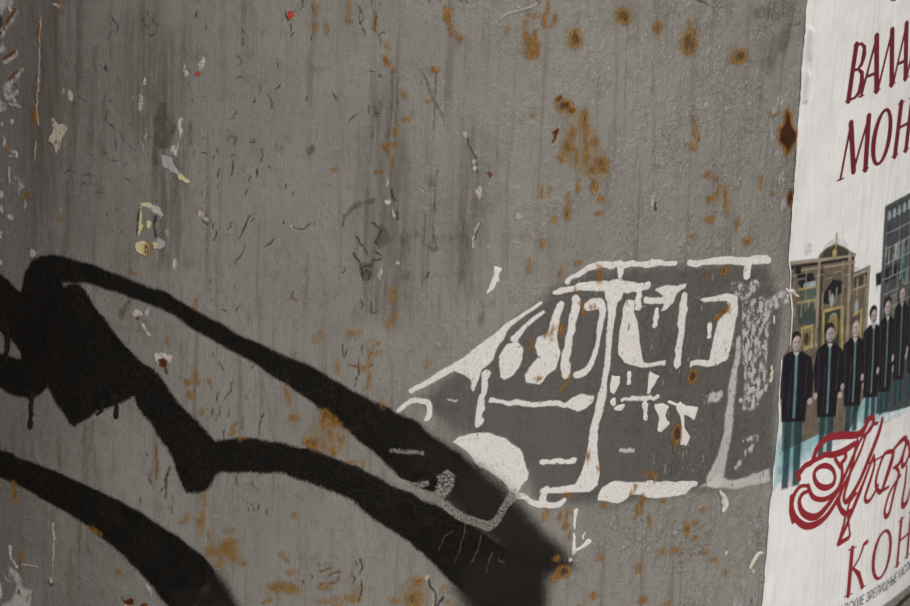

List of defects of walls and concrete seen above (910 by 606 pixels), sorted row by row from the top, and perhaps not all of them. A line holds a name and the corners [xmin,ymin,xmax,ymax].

peeling [0,0,23,126]
rust [524,0,557,59]
rust [682,23,697,55]
peeling [0,137,24,220]
peeling [48,118,67,153]
rust [552,95,608,222]
rust [771,107,797,157]
peeling [135,202,168,256]
peeling [0,545,38,606]